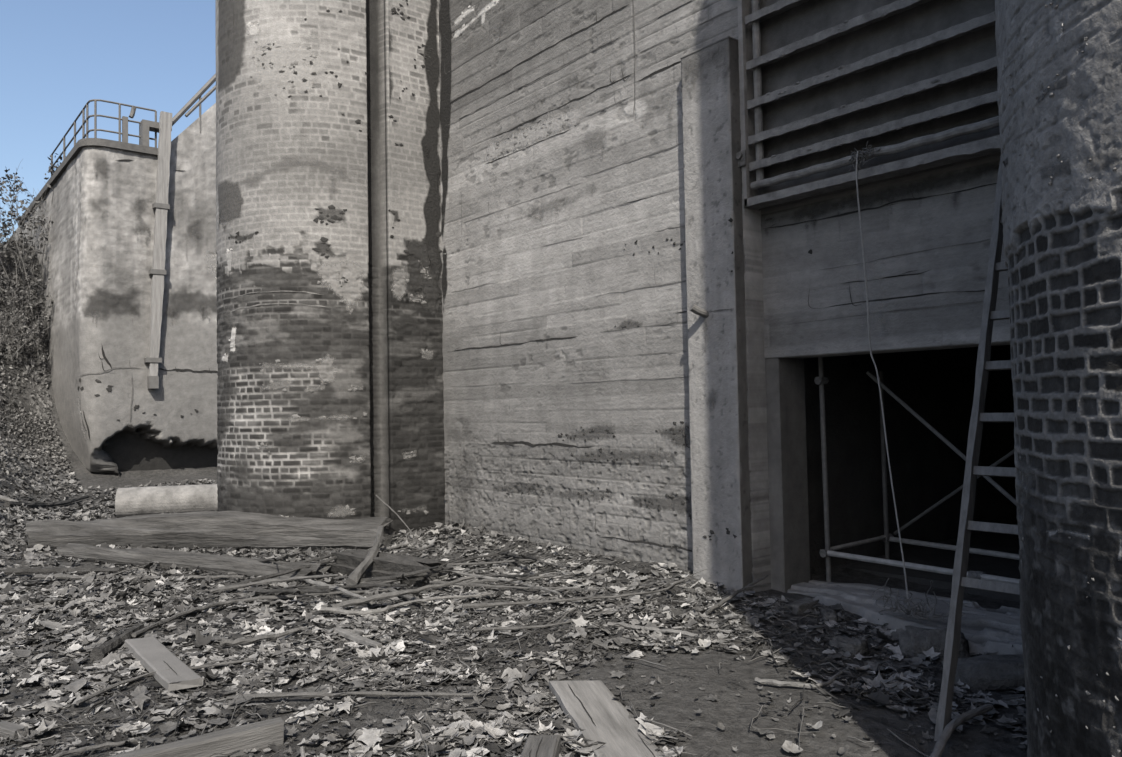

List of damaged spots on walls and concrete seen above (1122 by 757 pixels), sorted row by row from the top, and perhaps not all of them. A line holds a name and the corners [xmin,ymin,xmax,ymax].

spalling [226,231,259,271]
peeling [312,205,364,312]
crack [594,280,686,297]
peeling [222,327,236,362]
crack [452,309,729,383]
crack [472,440,593,448]